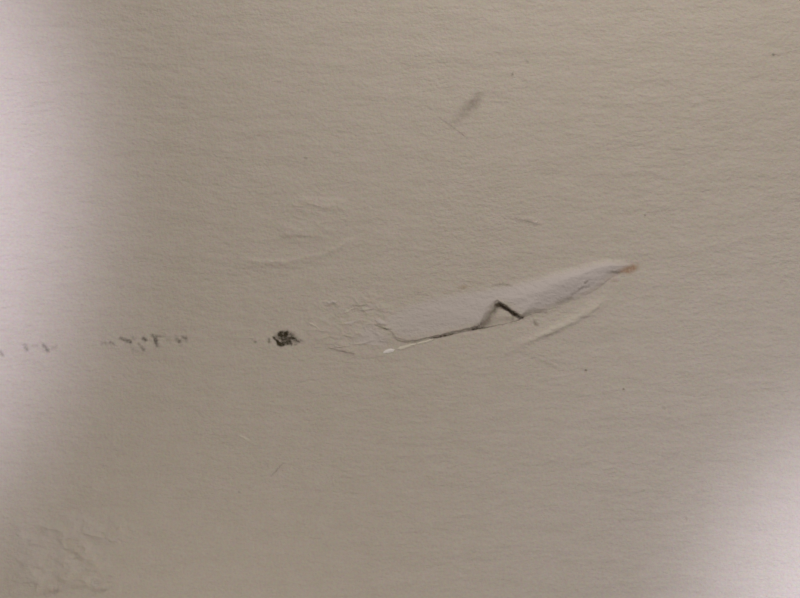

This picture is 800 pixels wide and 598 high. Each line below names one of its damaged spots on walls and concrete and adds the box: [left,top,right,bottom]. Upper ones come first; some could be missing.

crack [495,303,519,317]
crack [383,328,480,354]